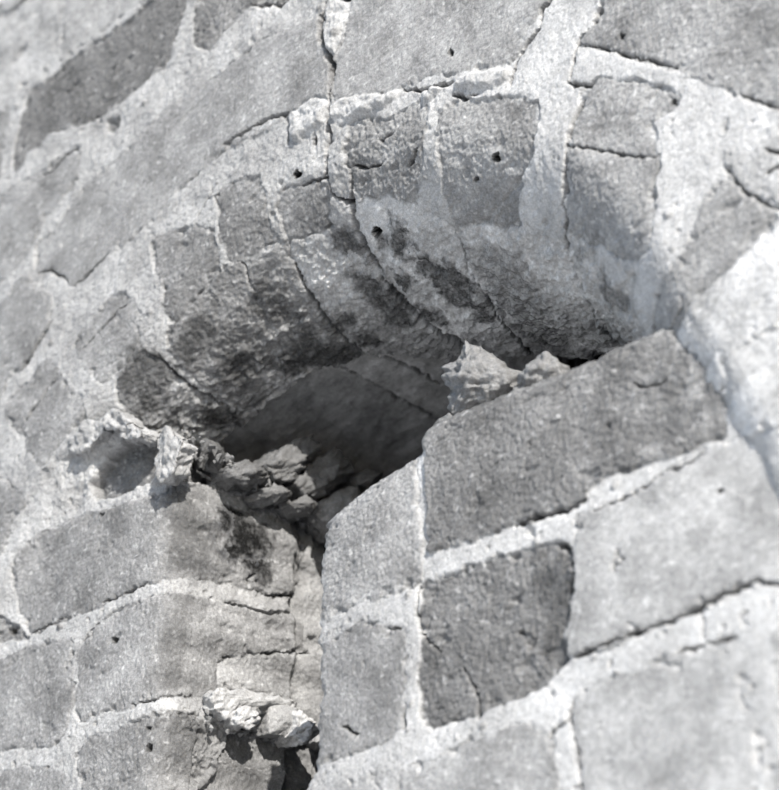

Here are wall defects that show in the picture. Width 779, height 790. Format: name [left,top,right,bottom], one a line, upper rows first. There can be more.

crack [252,0,288,8]
crack [509,0,552,86]
crack [560,3,679,254]
crack [741,92,779,109]
crack [301,0,480,346]
water stain [331,230,367,256]
water stain [353,221,499,327]
crack [456,230,535,356]
water stain [119,314,214,412]
water stain [278,336,384,375]
water stain [202,402,238,425]
water stain [218,504,275,586]